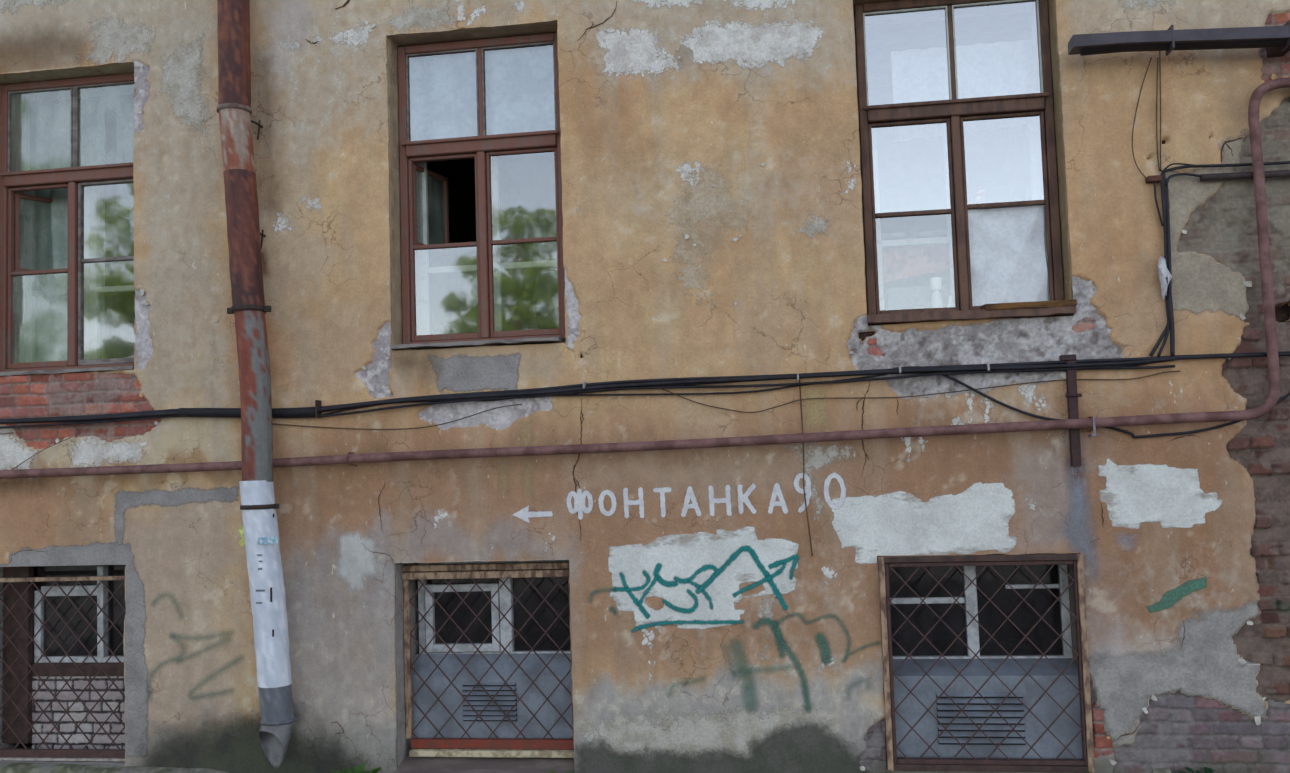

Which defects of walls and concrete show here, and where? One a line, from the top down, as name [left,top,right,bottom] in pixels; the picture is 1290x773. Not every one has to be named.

peeling [596,0,825,80]
flaking render [1260,48,1290,82]
flaking render [1265,12,1290,26]
spalling [847,276,1123,399]
flaking render [0,289,161,470]
flaking render [1091,97,1290,773]
water stain [576,725,864,773]